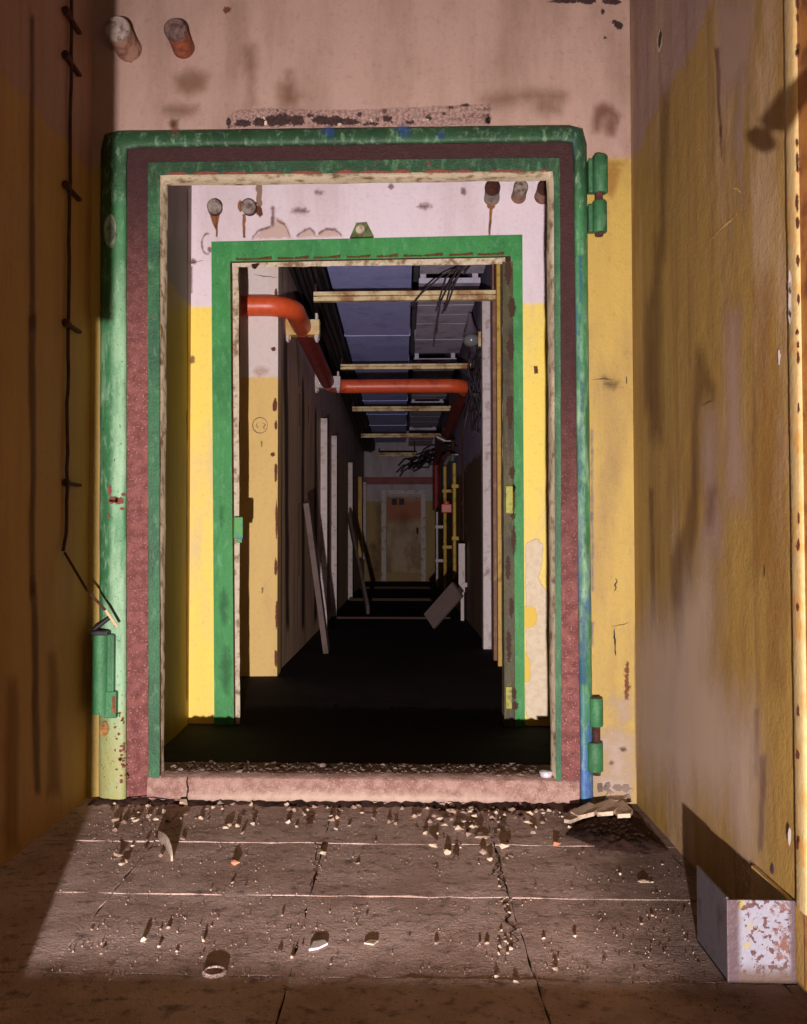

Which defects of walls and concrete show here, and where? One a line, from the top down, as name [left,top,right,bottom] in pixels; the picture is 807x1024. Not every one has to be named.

flaking render [551,0,623,30]
flaking render [226,103,491,128]
rust [238,201,263,238]
peeling [505,467,550,719]
crack [488,851,519,955]